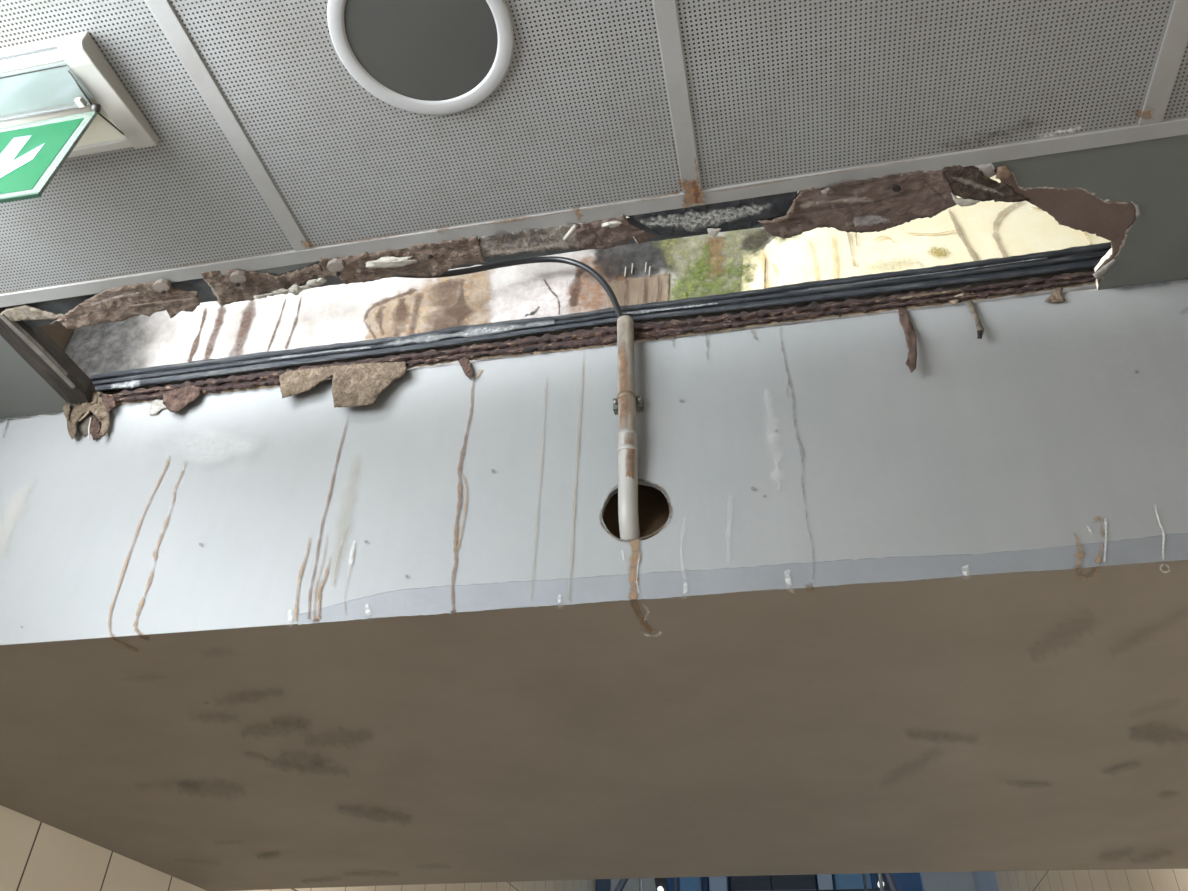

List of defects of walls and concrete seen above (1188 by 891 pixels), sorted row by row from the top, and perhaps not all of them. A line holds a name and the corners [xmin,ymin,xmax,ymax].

damp [272,270,517,359]
rust [570,260,631,310]
damp [595,238,678,278]
peeling [641,204,769,238]
flaking render [741,165,1140,291]
rust [100,272,1096,622]
crack [751,330,814,591]
rust [108,458,184,652]
rust [629,539,662,637]